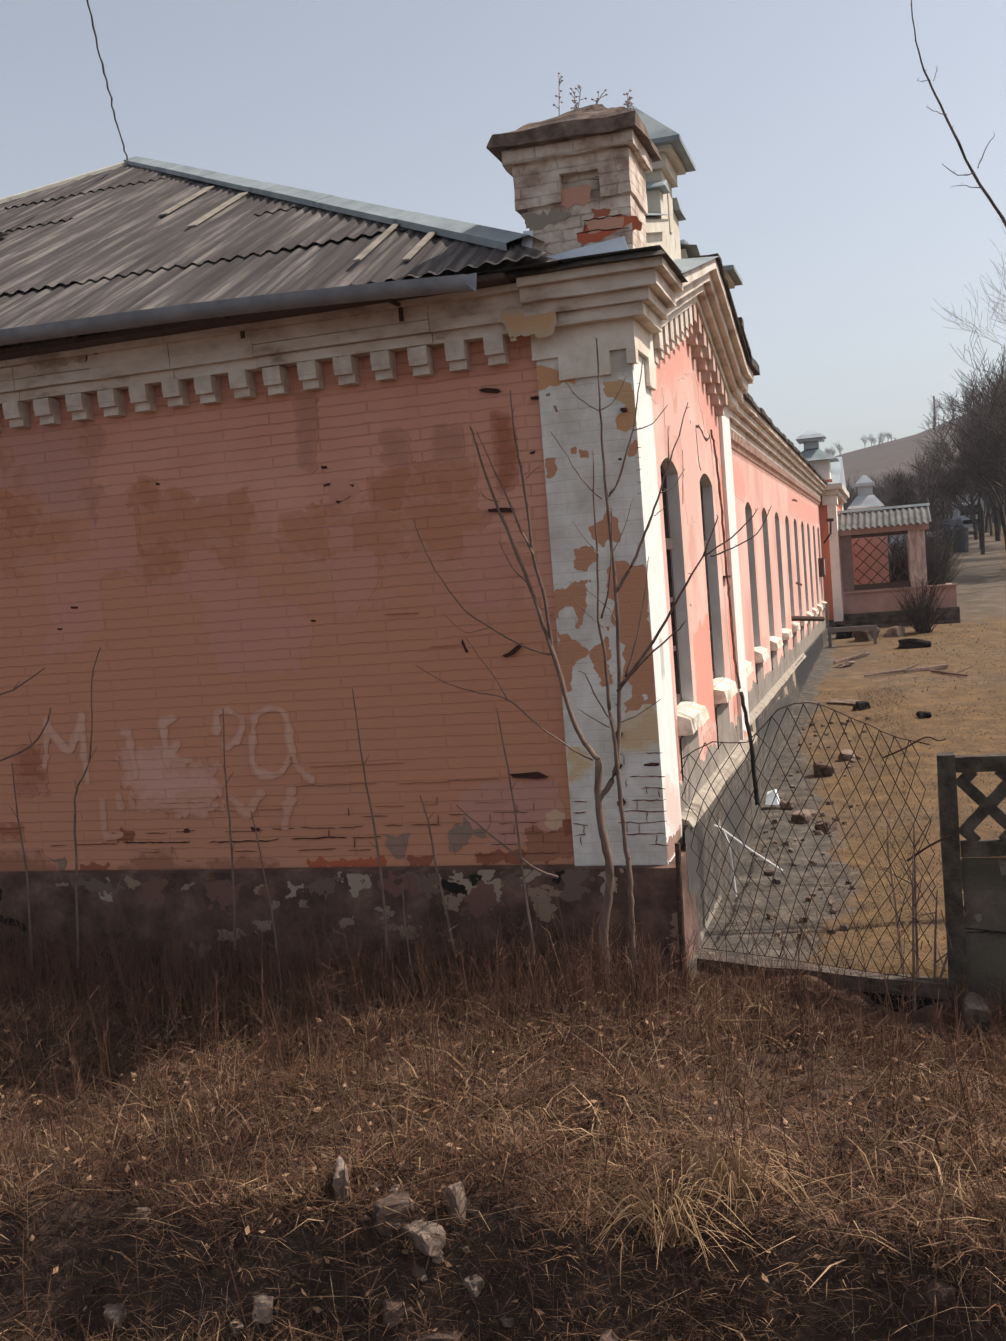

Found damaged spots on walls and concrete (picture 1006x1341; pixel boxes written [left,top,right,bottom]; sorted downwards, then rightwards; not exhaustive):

spalling [561,184,642,244]
damp [290,391,319,473]
peeling [530,450,558,478]
peeling [537,365,575,412]
spalling [570,447,589,458]
peeling [603,379,638,460]
damp [0,420,594,872]
peeling [554,509,656,713]
peeling [49,857,141,902]
spalling [181,855,387,941]
spalling [407,817,624,923]